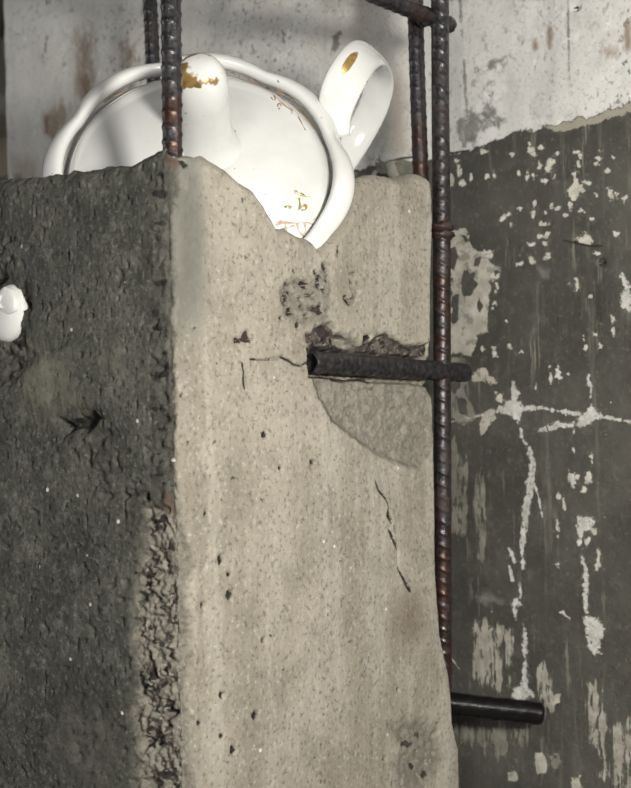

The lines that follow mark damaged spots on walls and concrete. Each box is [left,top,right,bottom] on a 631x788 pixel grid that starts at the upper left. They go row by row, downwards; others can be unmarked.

spalling [305,0,501,366]
peeling [517,142,559,183]
peeling [500,150,628,267]
crack [241,356,305,390]
peeling [568,454,593,493]
crack [375,482,411,593]
spalling [308,368,506,692]
peeling [576,516,601,614]
peeling [472,618,514,692]
peeling [454,718,562,775]
peeling [536,660,561,713]
peeling [585,680,631,788]